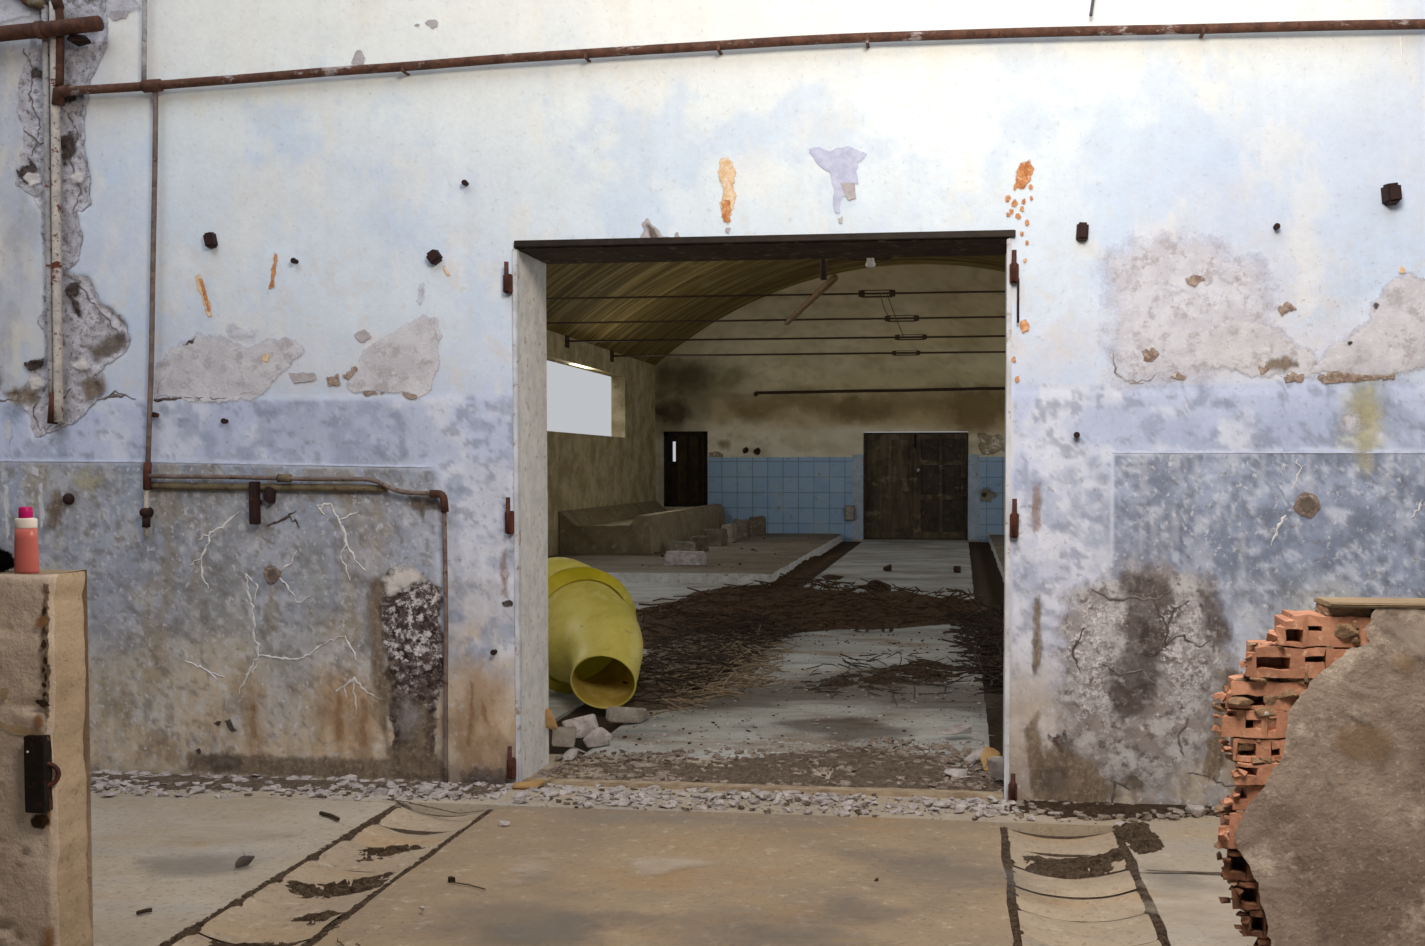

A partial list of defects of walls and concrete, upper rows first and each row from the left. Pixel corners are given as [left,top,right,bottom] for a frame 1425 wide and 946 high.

flaking render [0,0,139,437]
corrosion [718,157,736,233]
peeling [809,146,867,223]
corrosion [1005,161,1034,263]
corrosion [269,254,277,289]
flaking render [153,314,442,404]
flaking render [978,433,1005,455]
crack [185,503,381,715]
leakage [187,565,444,779]
leakage [462,769,508,785]
leakage [1037,730,1144,802]
leakage [1207,669,1239,779]